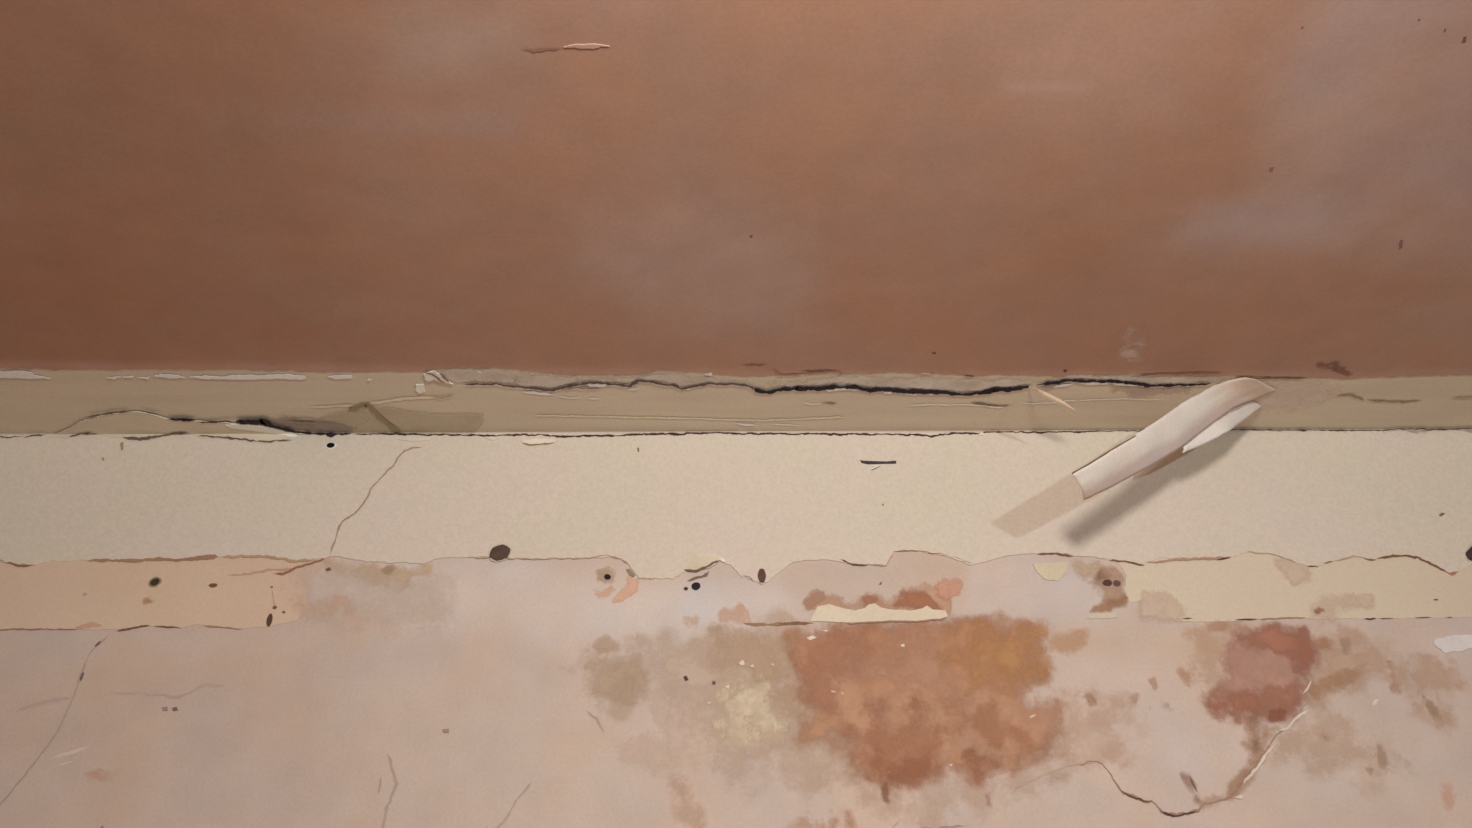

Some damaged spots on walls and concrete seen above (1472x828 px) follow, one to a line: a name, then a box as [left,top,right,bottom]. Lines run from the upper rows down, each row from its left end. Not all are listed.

crack [0,364,1305,576]
peeling [0,377,1472,631]
crack [1231,394,1472,433]
rust [786,580,1085,808]
crack [1015,681,1311,817]
rust [1194,620,1320,794]